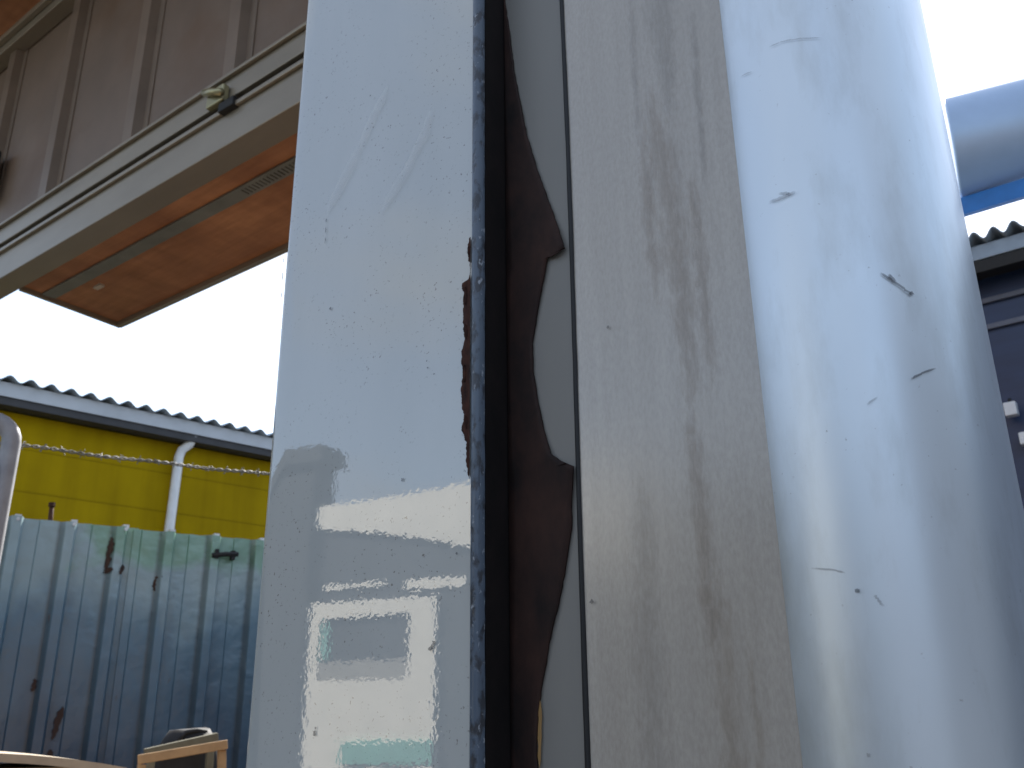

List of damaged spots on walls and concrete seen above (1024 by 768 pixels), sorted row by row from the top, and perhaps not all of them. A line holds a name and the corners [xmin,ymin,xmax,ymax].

corrosion [103,537,125,574]